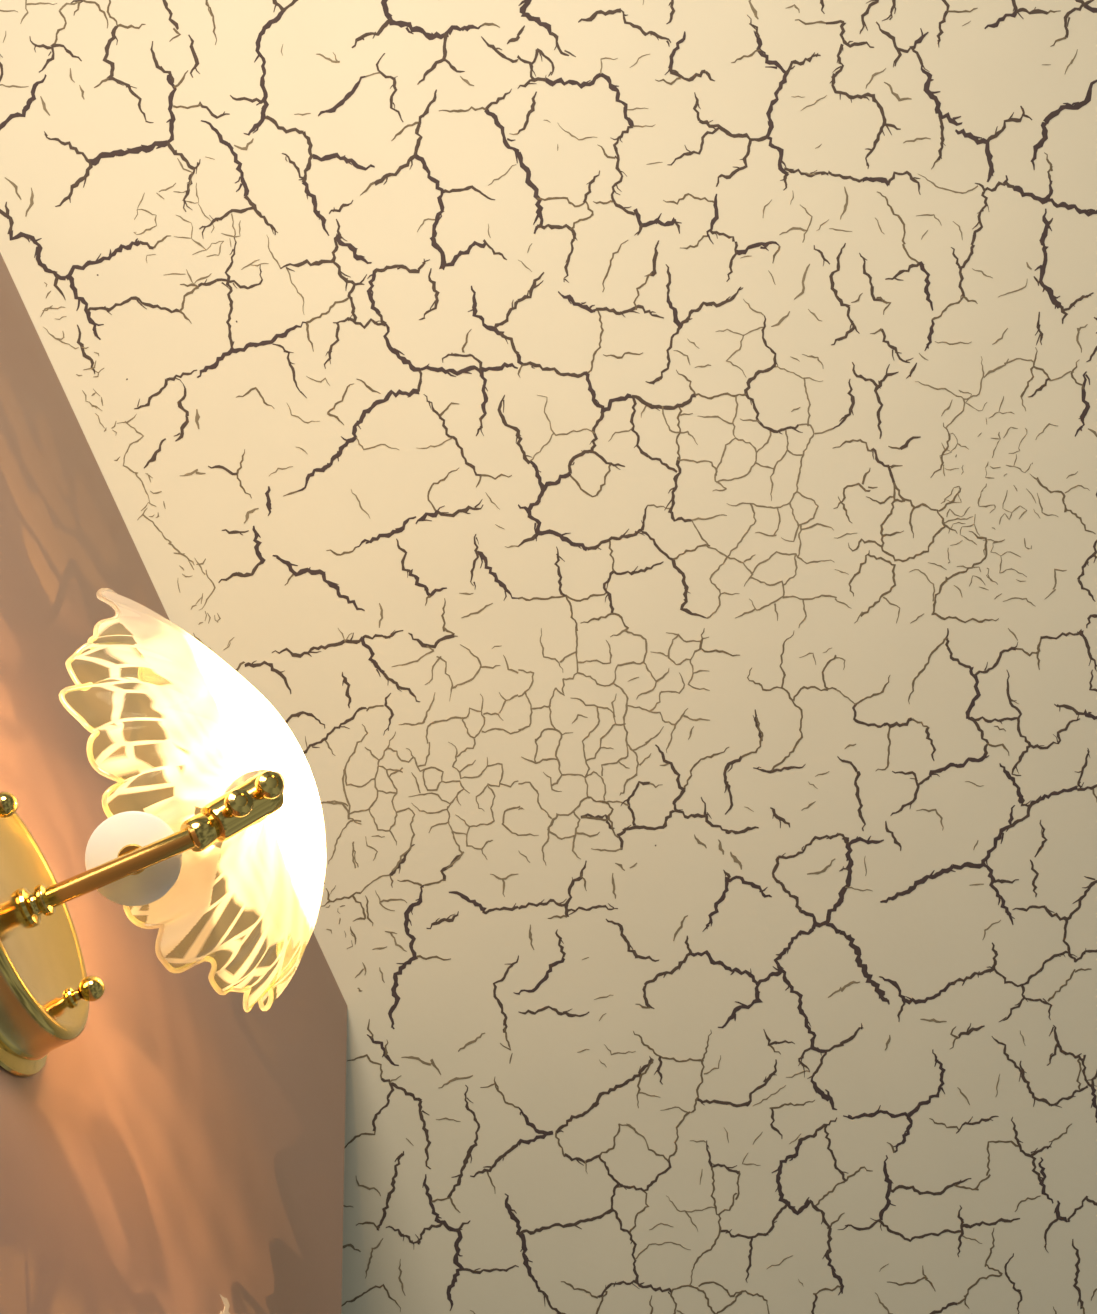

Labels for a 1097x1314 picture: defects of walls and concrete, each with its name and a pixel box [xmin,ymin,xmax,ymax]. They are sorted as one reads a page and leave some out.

crack [0,0,1097,1029]